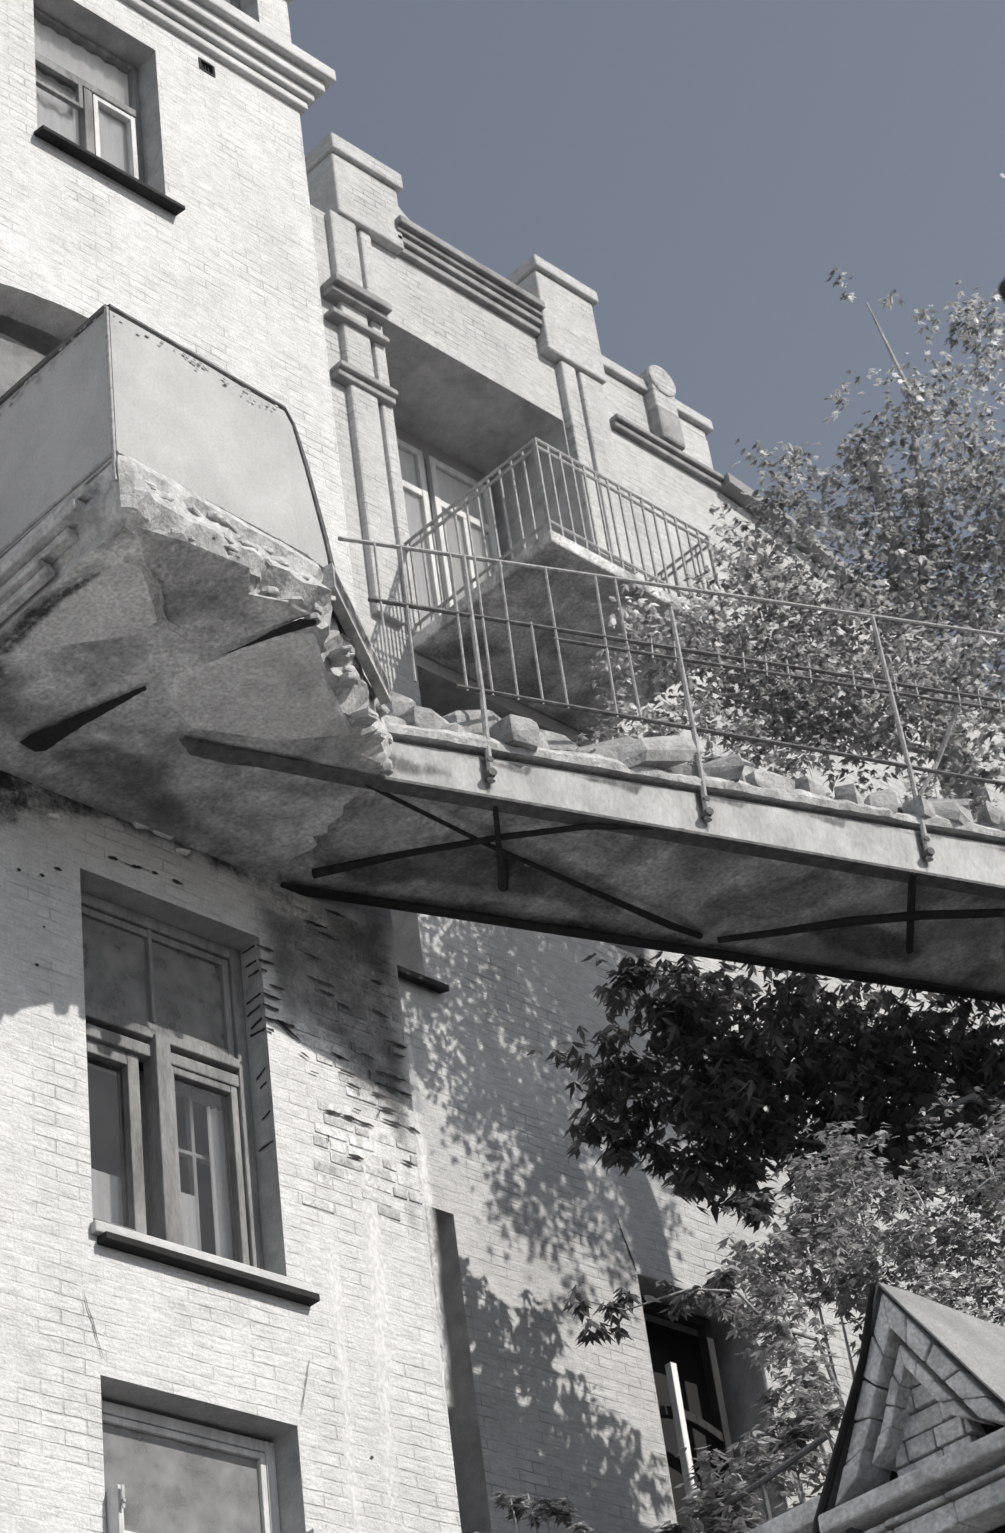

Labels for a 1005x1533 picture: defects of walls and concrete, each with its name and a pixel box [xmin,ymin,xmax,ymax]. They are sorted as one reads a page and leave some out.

peeling [0,479,393,776]
water stain [0,770,155,836]
water stain [175,841,247,877]
water stain [269,914,419,1112]
water stain [363,1131,387,1426]
water stain [426,1194,439,1306]